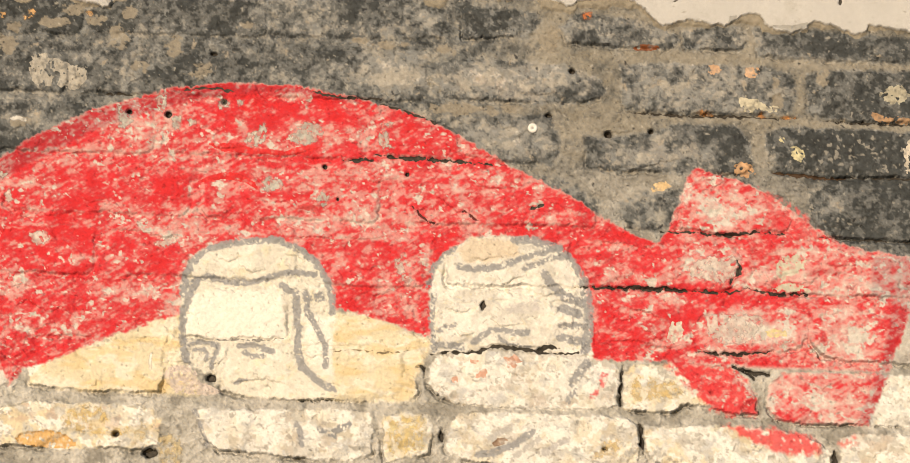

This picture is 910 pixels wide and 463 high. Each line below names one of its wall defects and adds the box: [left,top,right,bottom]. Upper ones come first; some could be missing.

peeling [773,22,809,32]
spalling [745,67,759,78]